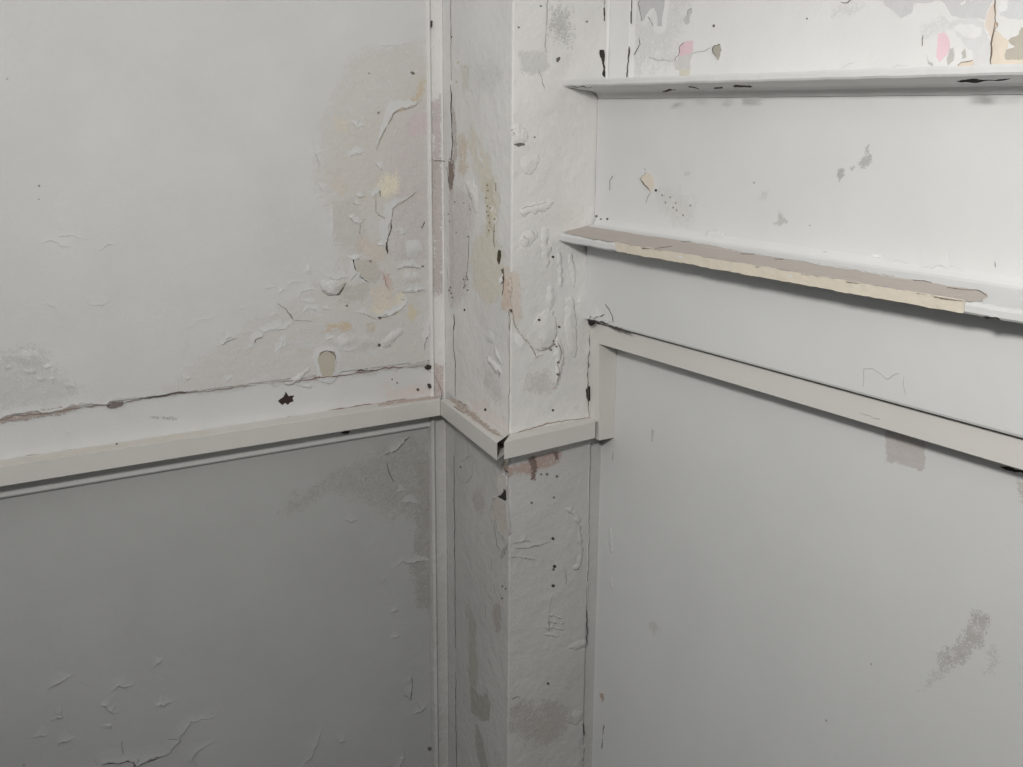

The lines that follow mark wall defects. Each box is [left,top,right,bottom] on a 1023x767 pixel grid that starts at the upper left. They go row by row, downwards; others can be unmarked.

peeling [636,0,670,35]
peeling [708,39,726,66]
peeling [874,0,1023,66]
damp [153,36,524,401]
peeling [564,215,988,313]
crack [0,243,469,420]
peeling [575,294,614,326]
peeling [311,334,342,383]
peeling [0,387,188,419]